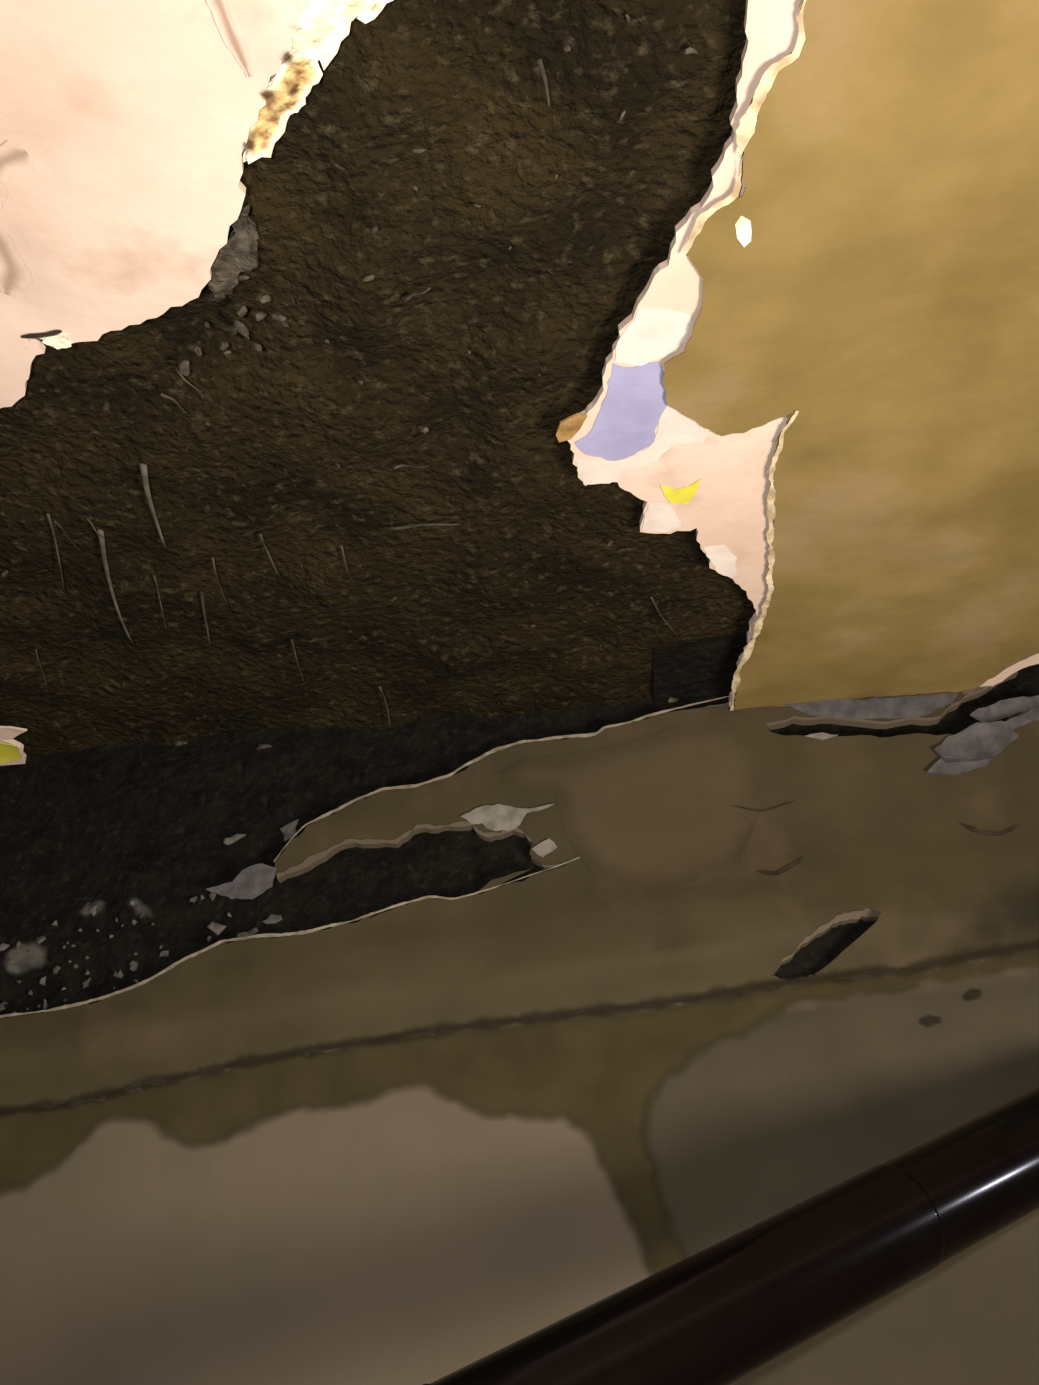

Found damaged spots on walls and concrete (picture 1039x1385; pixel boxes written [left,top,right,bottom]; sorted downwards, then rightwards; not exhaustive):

crack [206,0,253,78]
crack [0,141,34,297]
crack [21,330,62,339]
spalling [0,0,1039,1108]
crack [0,942,1039,1115]
leakage [0,949,1039,1274]
leakage [732,1209,1039,1385]